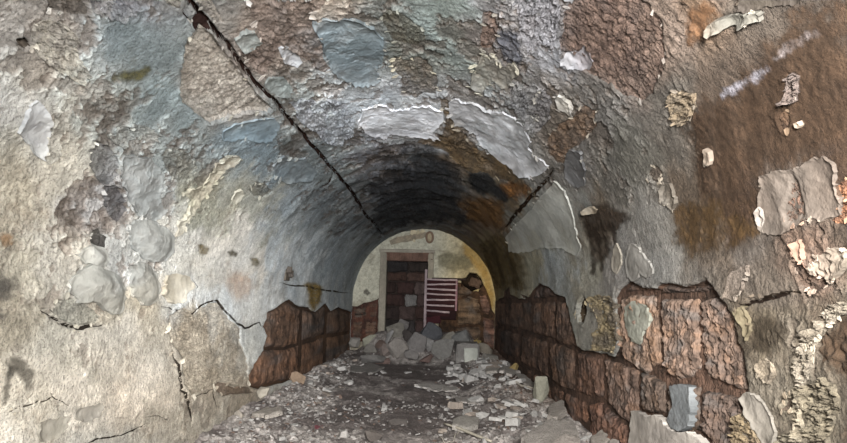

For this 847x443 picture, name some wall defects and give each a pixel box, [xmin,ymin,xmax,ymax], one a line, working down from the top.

flaking render [180,0,332,127]
crack [183,0,380,231]
peeling [379,8,517,182]
flaking render [503,0,666,106]
water stain [0,278,11,299]
water stain [4,358,33,404]
crack [89,415,166,443]
flaking render [161,273,379,401]
crack [504,170,553,228]
flaking render [439,280,766,443]
water stain [580,205,627,275]
flaking render [753,207,765,235]